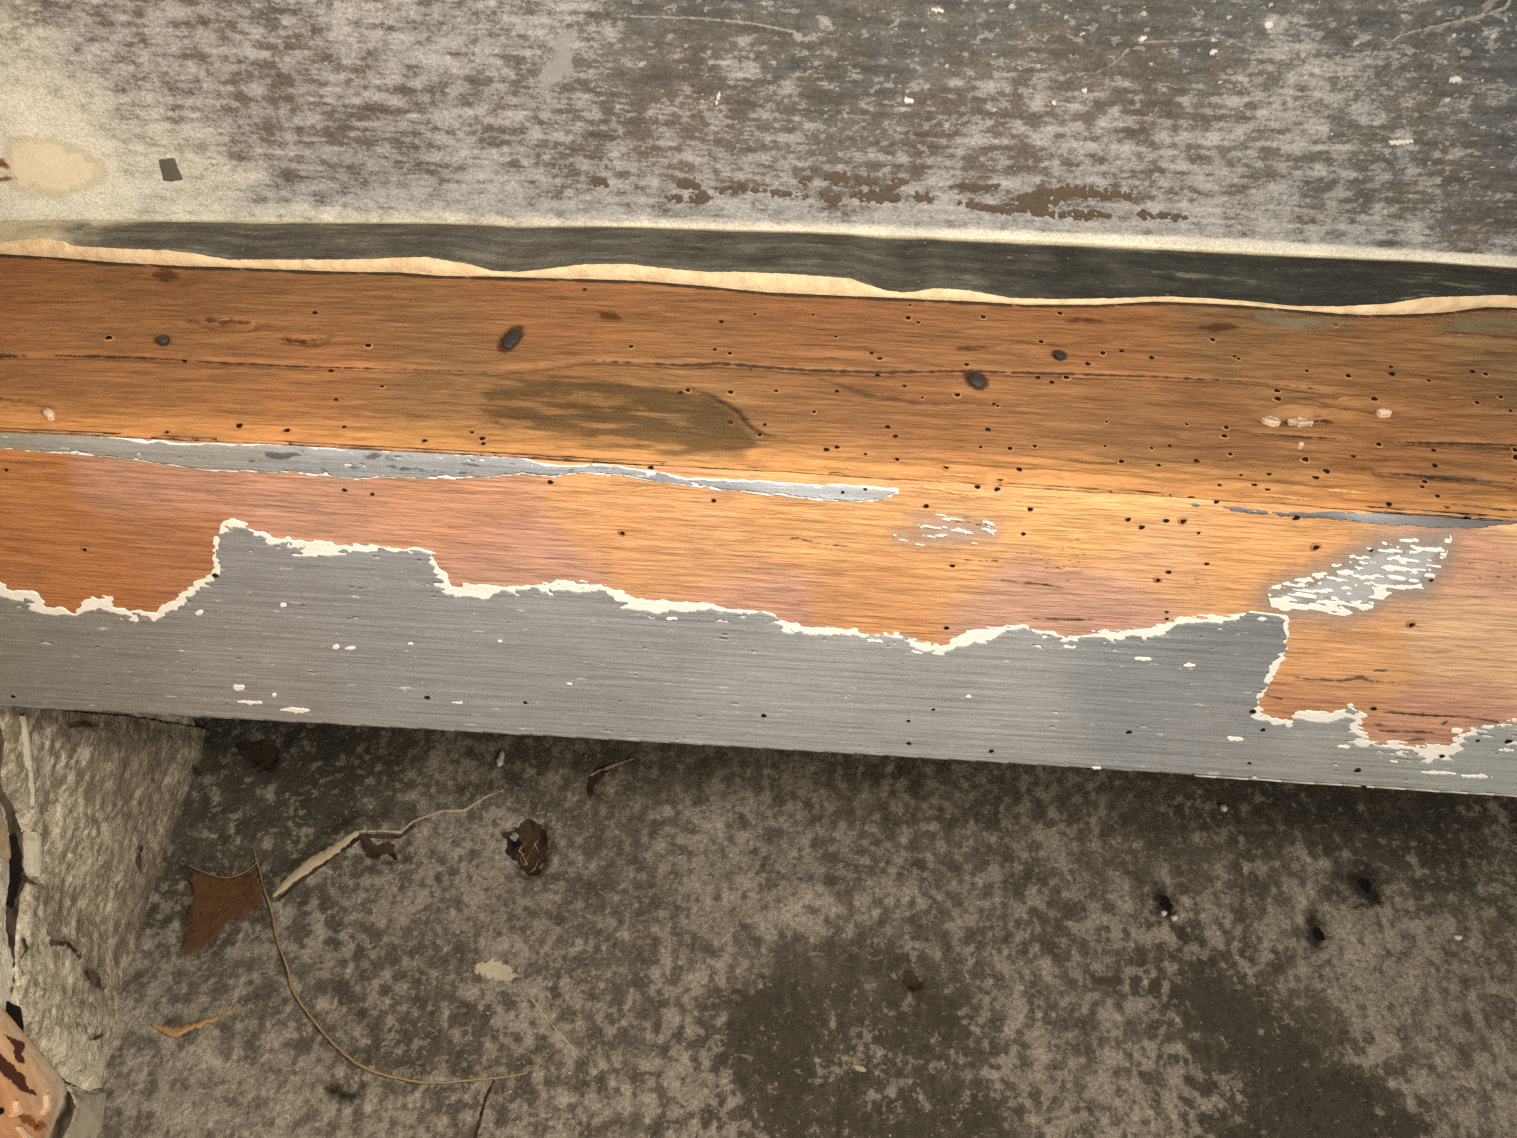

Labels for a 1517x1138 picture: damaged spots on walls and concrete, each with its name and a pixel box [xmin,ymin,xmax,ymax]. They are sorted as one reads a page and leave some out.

peeling [0,432,899,502]
peeling [0,506,1517,797]
crack [0,727,27,993]
spalling [1346,863,1379,901]
leakage [720,976,827,1138]
leakage [914,993,973,1041]
leakage [1090,969,1383,1138]